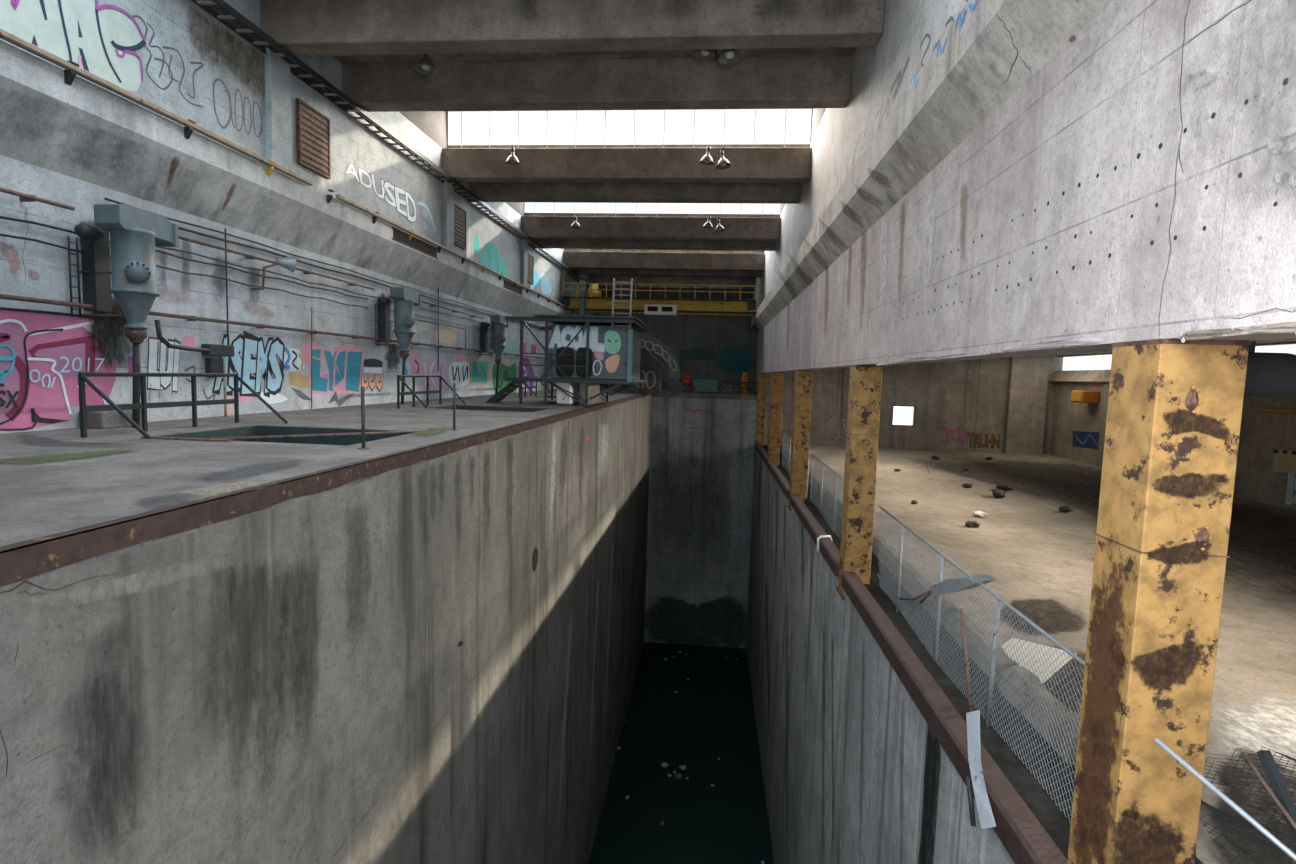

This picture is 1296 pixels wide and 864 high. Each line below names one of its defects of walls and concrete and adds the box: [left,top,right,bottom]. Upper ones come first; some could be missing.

crack [1159,0,1251,336]
corrosion [1164,409,1230,440]
corrosion [1153,473,1228,498]
corrosion [1148,540,1212,564]
corrosion [1073,543,1202,864]
crack [0,730,69,777]